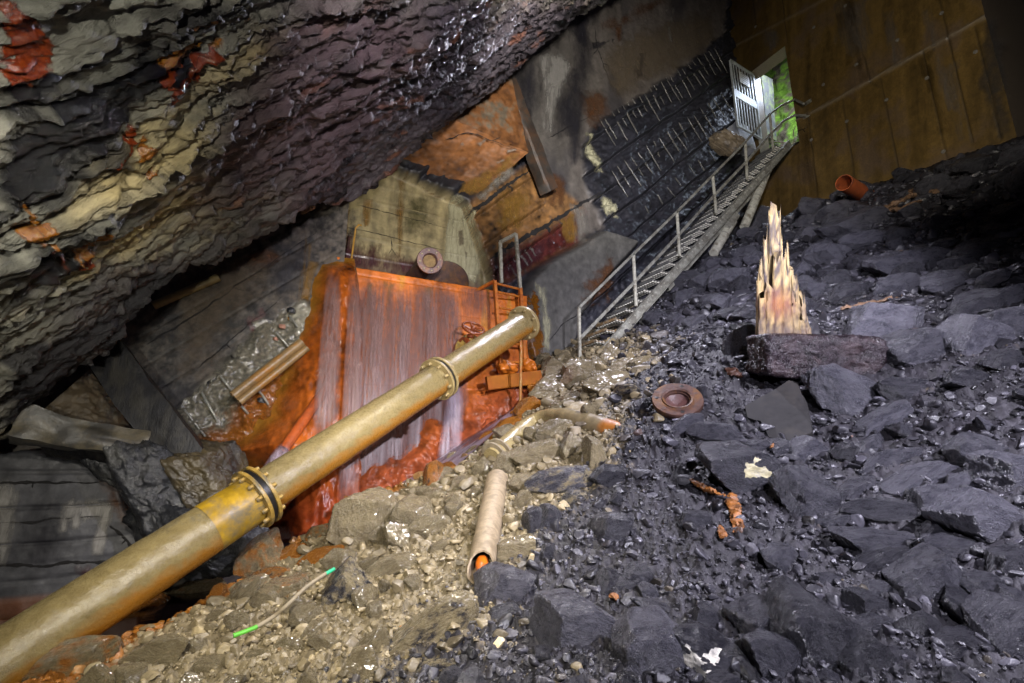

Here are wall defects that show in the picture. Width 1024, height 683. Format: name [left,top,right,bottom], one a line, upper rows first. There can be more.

crack [350,132,529,255]
rust [527,291,545,361]
rust [203,372,285,443]